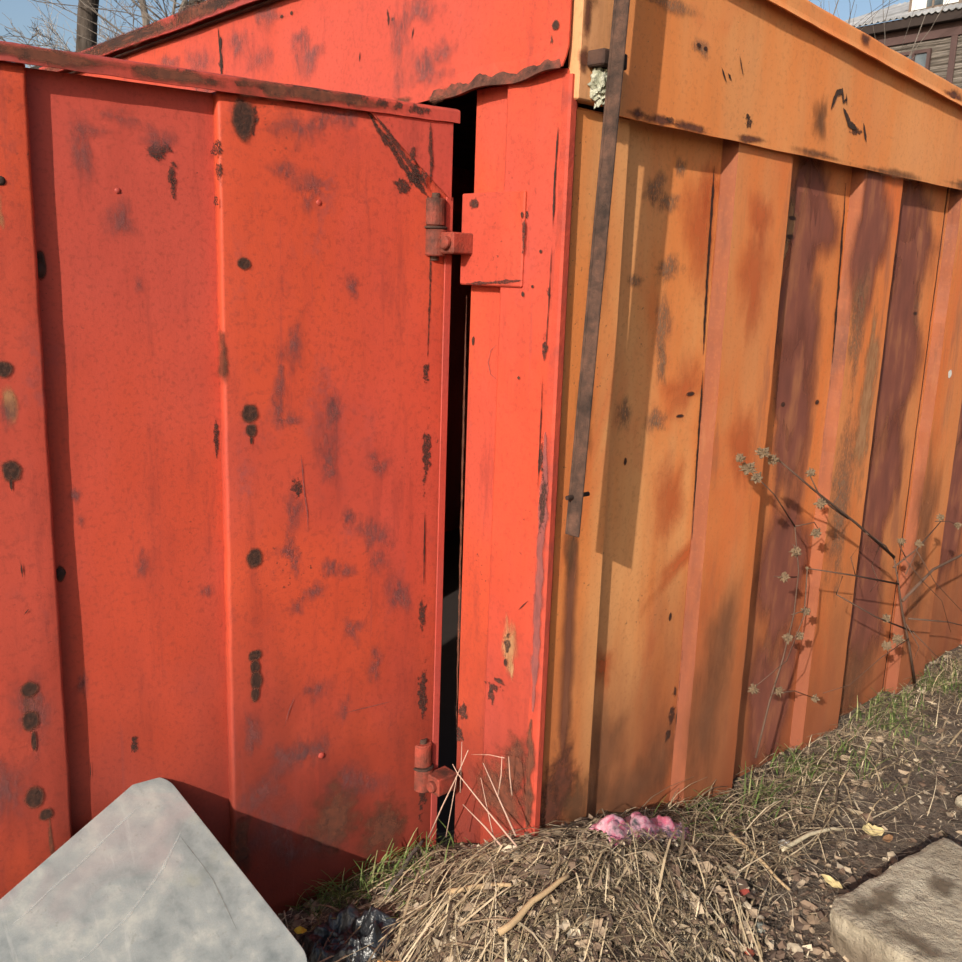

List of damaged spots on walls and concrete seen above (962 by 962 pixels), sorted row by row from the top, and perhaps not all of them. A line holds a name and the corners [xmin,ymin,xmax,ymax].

corrosion [131,64,217,84]
corrosion [239,78,376,107]
corrosion [816,108,826,135]
corrosion [241,404,258,444]
corrosion [246,549,262,568]
corrosion [248,650,262,702]
corrosion [476,535,585,830]
corrosion [20,681,43,751]